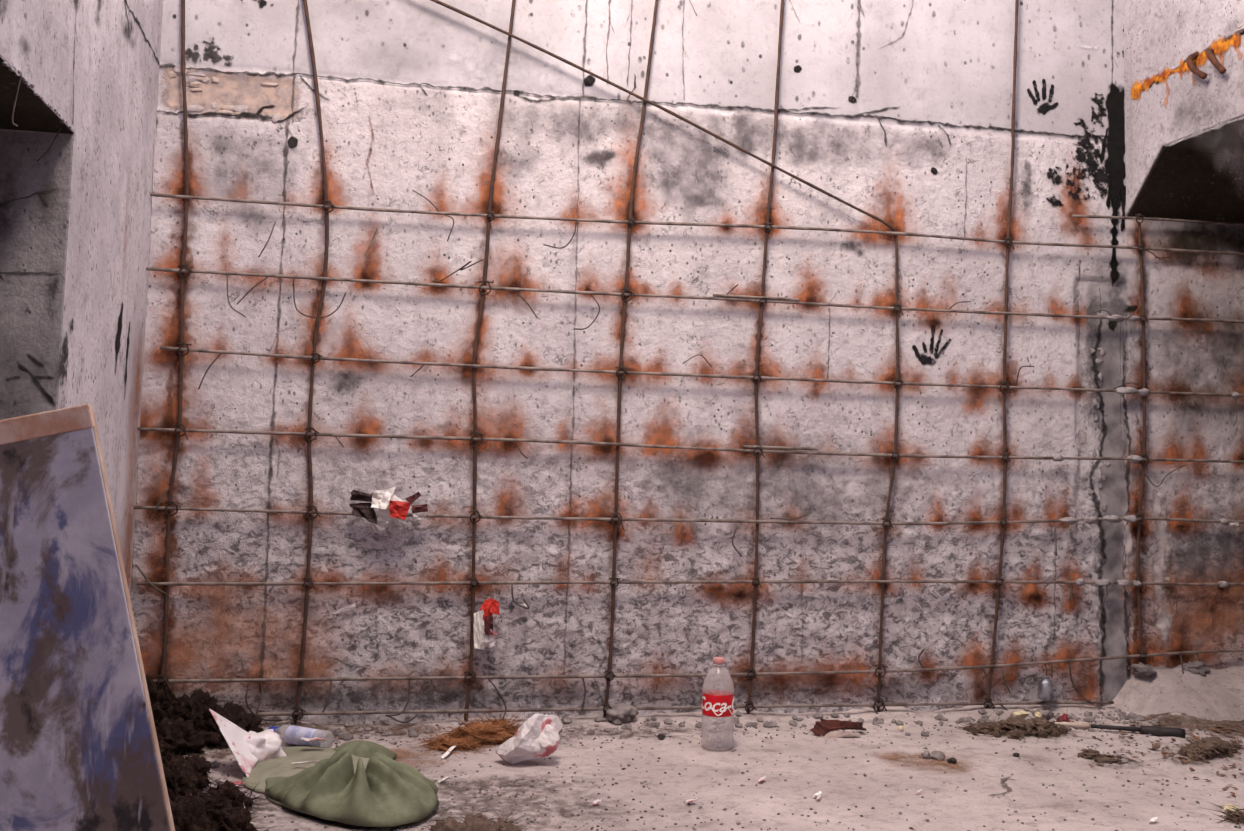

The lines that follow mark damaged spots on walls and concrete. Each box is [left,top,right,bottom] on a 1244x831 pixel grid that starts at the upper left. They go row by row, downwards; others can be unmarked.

rust [1131,33,1242,106]
water stain [736,116,785,153]
water stain [586,151,615,166]
water stain [662,131,719,204]
crack [8,188,62,203]
water stain [1171,223,1244,262]
crack [0,271,57,280]
rust [353,245,380,289]
rust [447,264,536,381]
crack [124,0,1108,692]
crack [5,354,55,405]
rust [644,425,788,467]